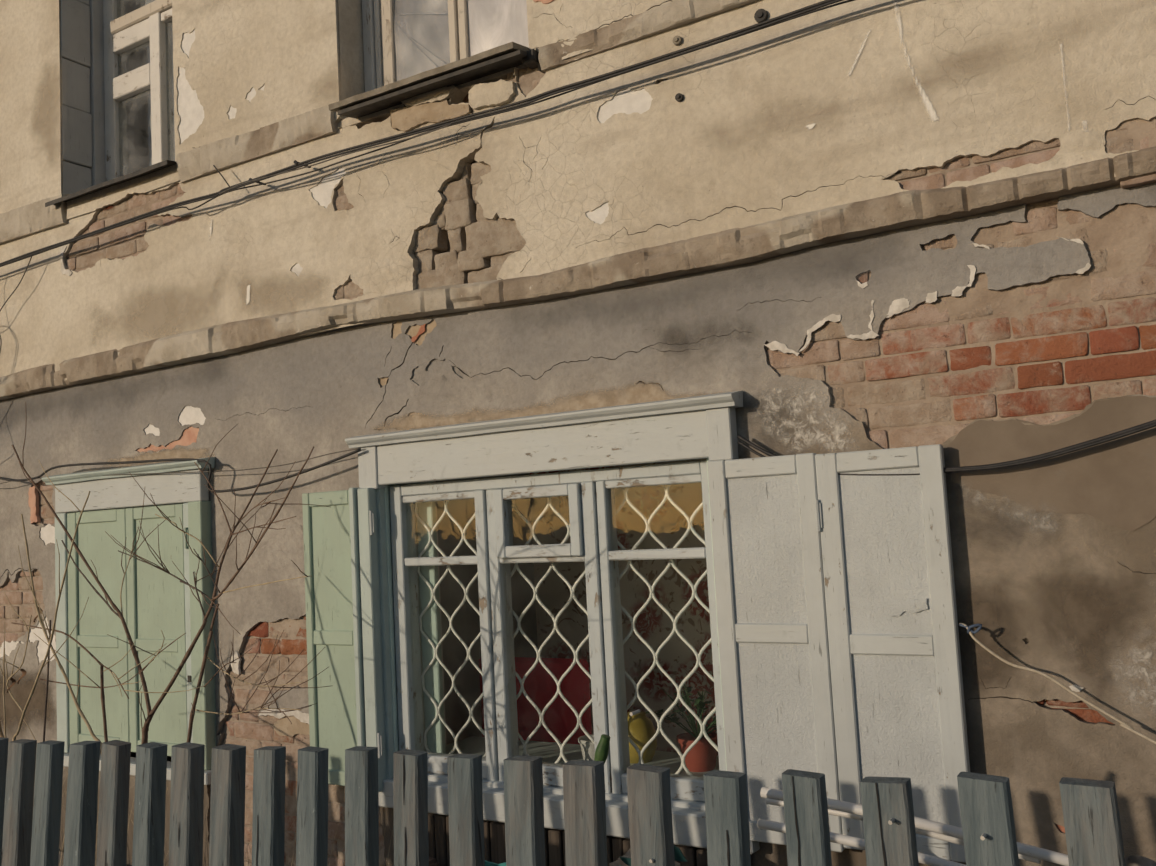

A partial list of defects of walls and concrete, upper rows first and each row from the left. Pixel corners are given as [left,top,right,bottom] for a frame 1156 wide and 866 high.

peeling [177,29,204,144]
peeling [597,80,666,123]
spalling [59,184,192,276]
peeling [309,168,354,211]
spalling [886,139,1061,191]
crack [439,297,821,380]
spalling [763,198,1156,451]
peeling [137,406,206,452]
crack [367,342,414,430]
spalling [0,569,56,663]
spalling [221,615,310,866]
spalling [327,784,345,866]